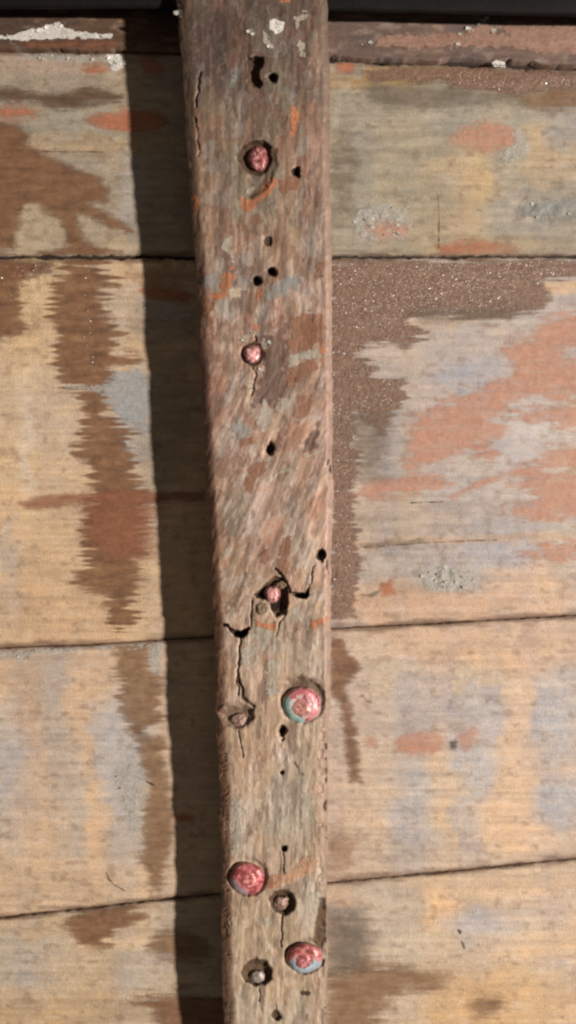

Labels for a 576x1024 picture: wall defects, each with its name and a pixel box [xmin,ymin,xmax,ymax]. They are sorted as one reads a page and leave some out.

crack [277,565,327,633]
crack [221,620,254,707]